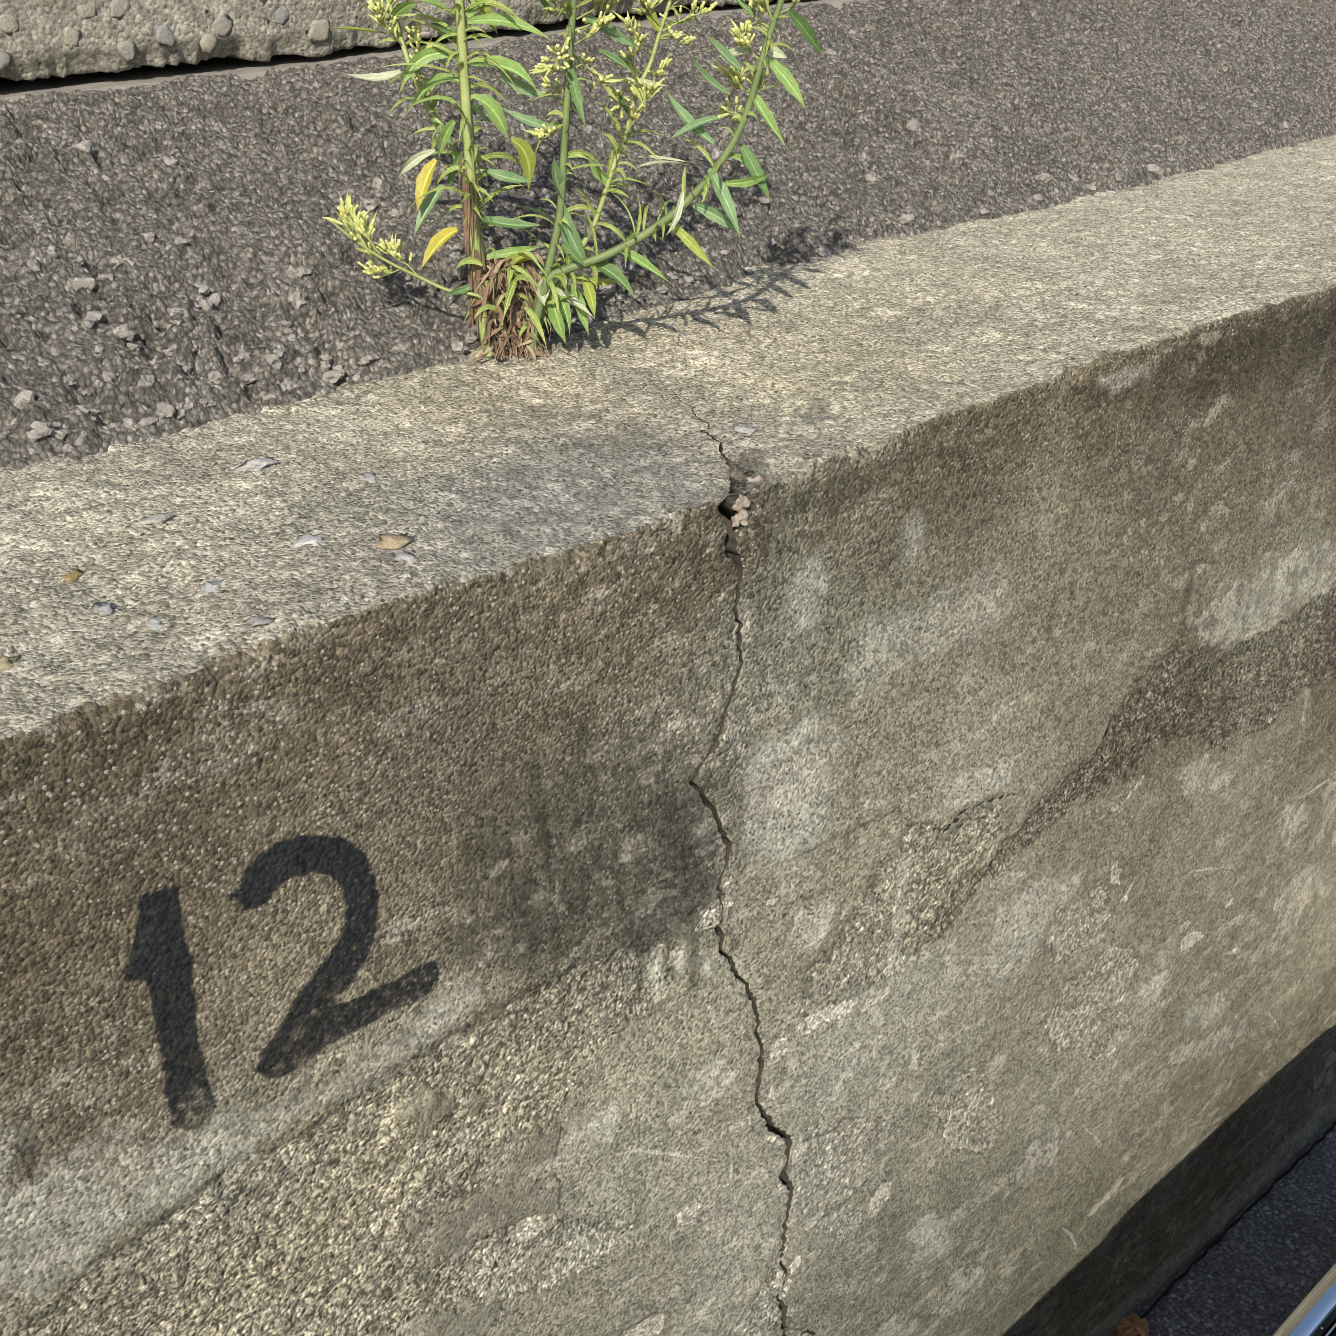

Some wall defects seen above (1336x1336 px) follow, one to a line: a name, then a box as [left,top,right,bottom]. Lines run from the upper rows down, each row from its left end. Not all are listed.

crack [546,345,835,1336]
crack [934,793,1016,832]
damp [640,936,712,1002]